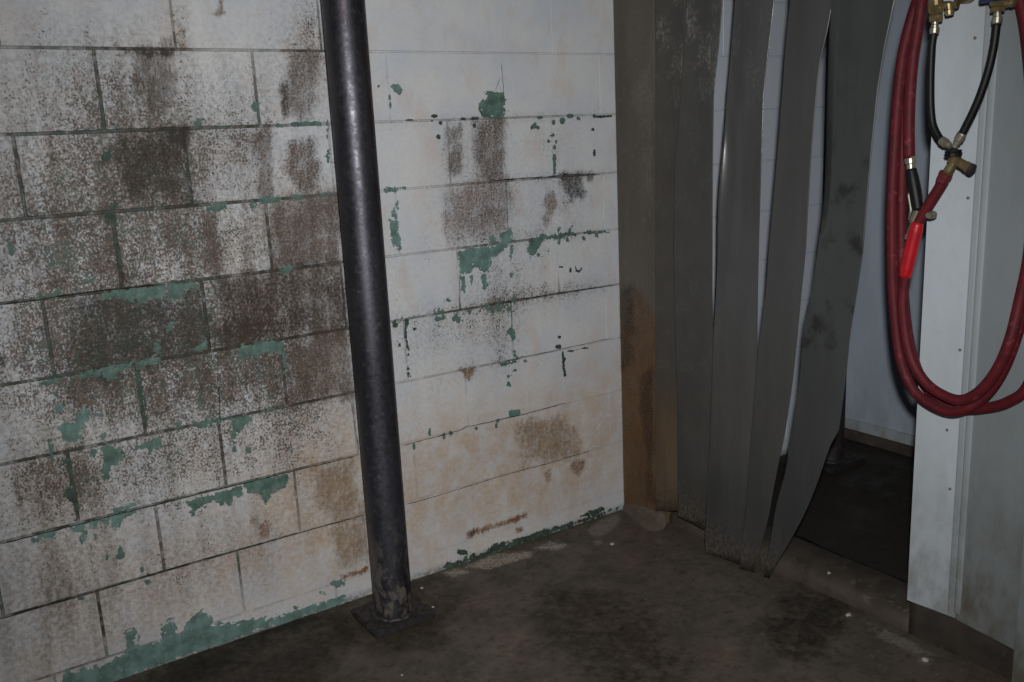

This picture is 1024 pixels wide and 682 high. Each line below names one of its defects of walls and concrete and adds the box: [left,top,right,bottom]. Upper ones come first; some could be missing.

damp [123,46,175,112]
damp [280,49,320,119]
peeling [461,91,507,128]
damp [443,117,510,240]
damp [562,172,593,201]
damp [72,125,355,409]
peeling [457,227,514,293]
peeling [527,225,610,258]
peeling [176,472,290,516]
rust [467,513,526,538]
peeling [439,506,619,569]
peeling [62,579,347,682]